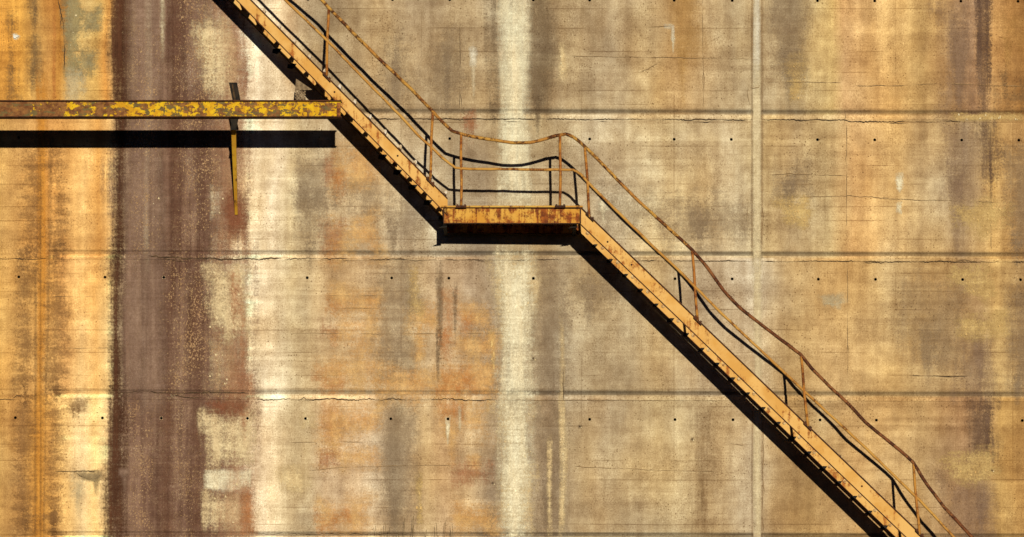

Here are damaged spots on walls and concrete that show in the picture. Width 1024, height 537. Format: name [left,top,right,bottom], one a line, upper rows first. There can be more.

damp [977,0,998,178]
crack [376,55,1024,277]
rust [226,191,247,233]
crack [152,254,571,262]
crack [118,391,492,401]
rust [384,334,496,402]